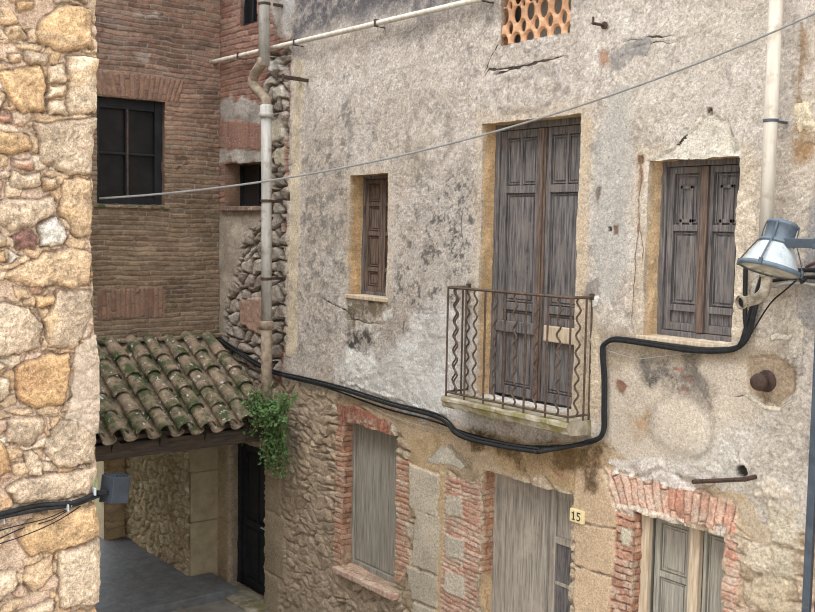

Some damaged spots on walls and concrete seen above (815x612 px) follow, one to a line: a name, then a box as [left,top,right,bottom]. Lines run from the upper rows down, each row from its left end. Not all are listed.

crack [485,44,565,75]
flaking render [792,99,815,132]
flaking render [731,177,757,346]